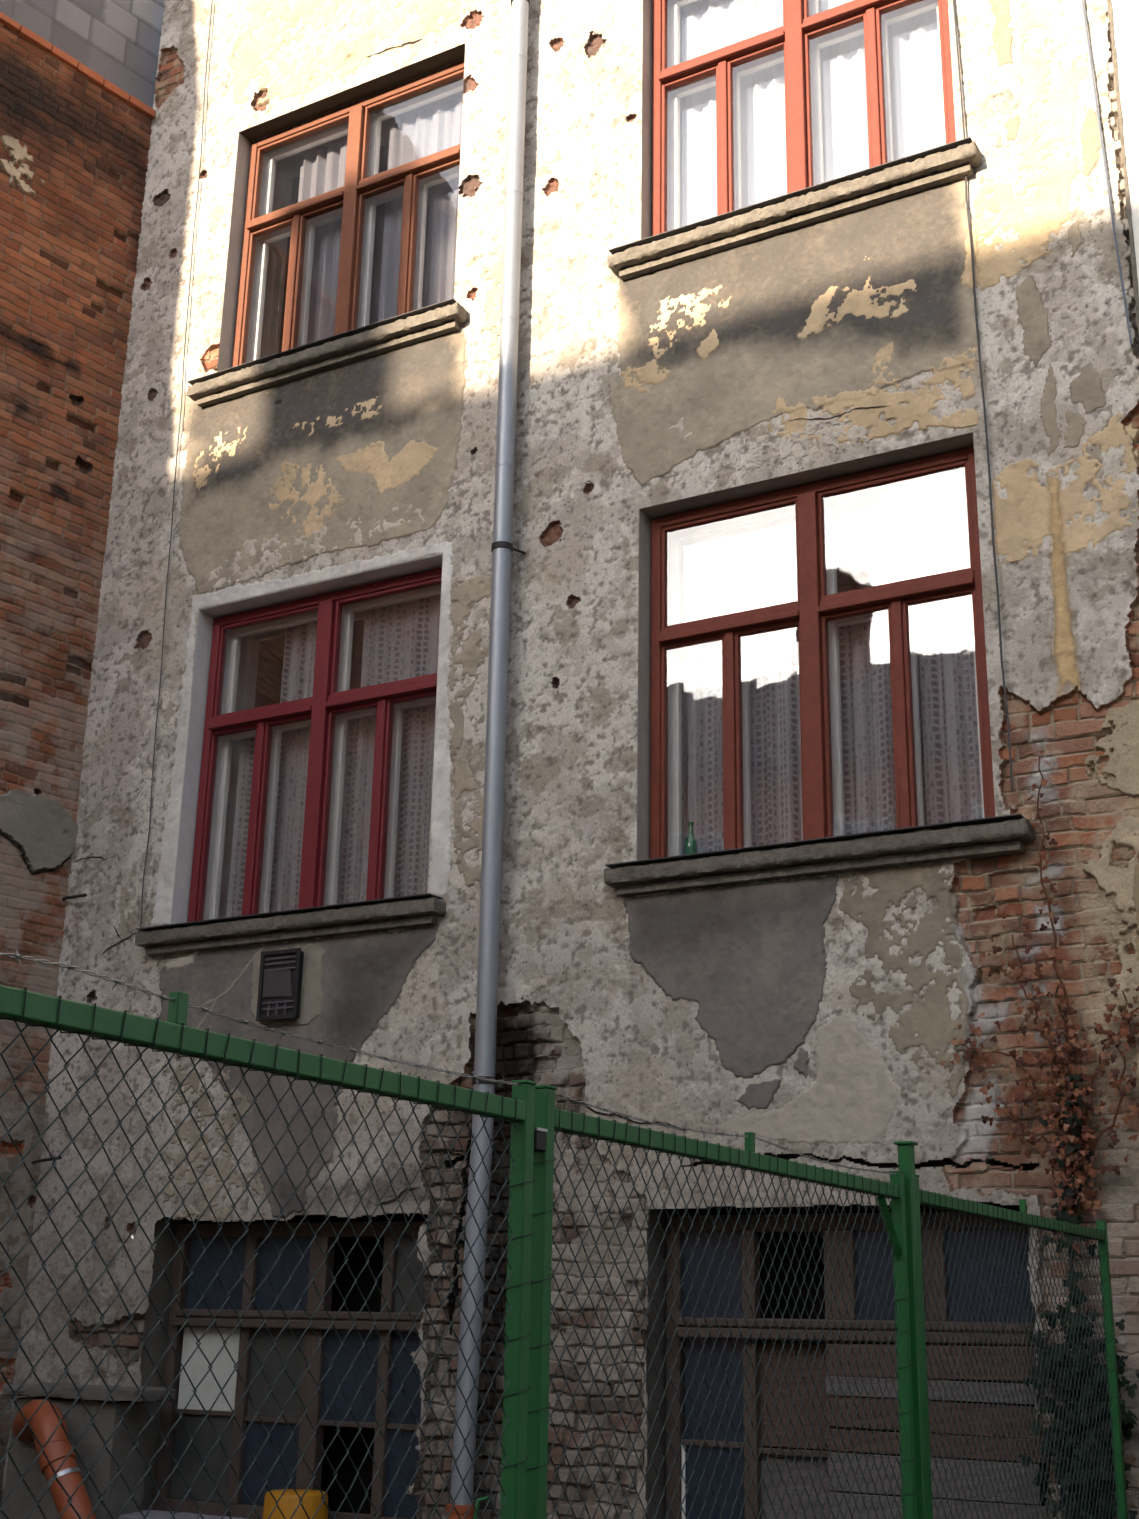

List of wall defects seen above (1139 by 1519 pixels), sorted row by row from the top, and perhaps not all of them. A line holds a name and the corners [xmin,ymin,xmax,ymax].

flaking render [1080,11,1139,370]
peeling [621,285,731,394]
peeling [731,340,979,471]
peeling [797,256,916,341]
flaking render [1015,275,1107,456]
peeling [207,440,438,593]
flaking render [942,401,1139,1519]
flaking render [497,999,586,1115]
crack [584,1105,723,1167]
crack [758,1152,1039,1172]
flaking render [411,1106,473,1519]
flaking render [546,1130,651,1519]